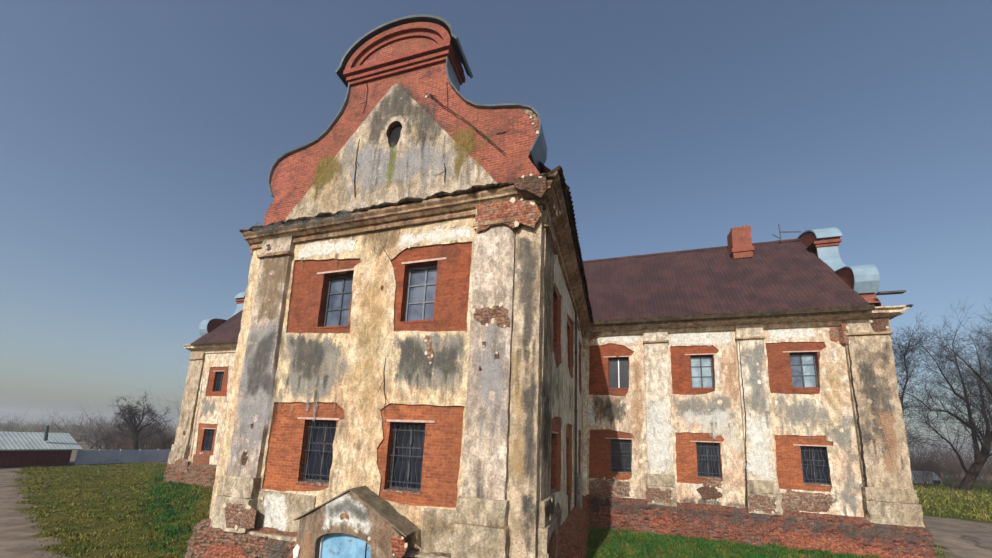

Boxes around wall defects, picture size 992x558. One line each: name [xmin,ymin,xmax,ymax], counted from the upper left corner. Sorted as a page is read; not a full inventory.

water stain [253,86,461,235]
water stain [367,228,400,255]
flaking render [391,173,561,364]
water stain [239,255,346,448]
flaking render [223,402,371,541]
water stain [393,333,463,389]
water stain [516,239,552,549]
flaking render [547,285,640,558]
flaking render [670,330,733,395]
flaking render [644,401,836,533]
flaking render [766,323,849,395]
water stain [742,344,928,547]